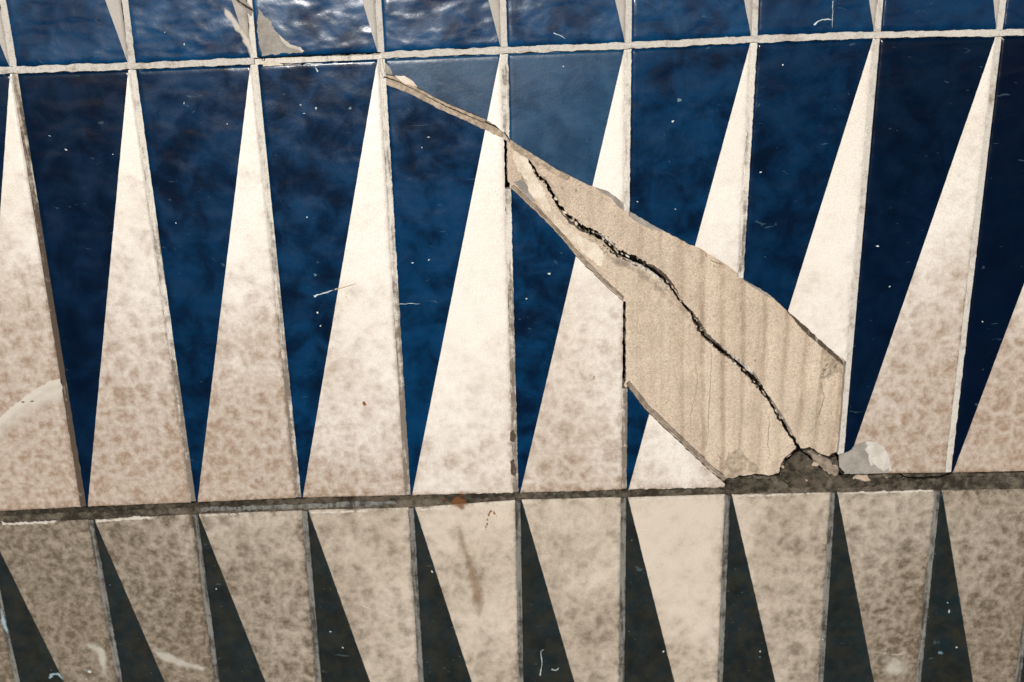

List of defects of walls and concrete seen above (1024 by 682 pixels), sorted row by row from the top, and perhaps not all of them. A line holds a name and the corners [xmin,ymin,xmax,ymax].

crack [380,58,848,477]
spalling [506,136,932,497]
crack [875,471,1024,481]